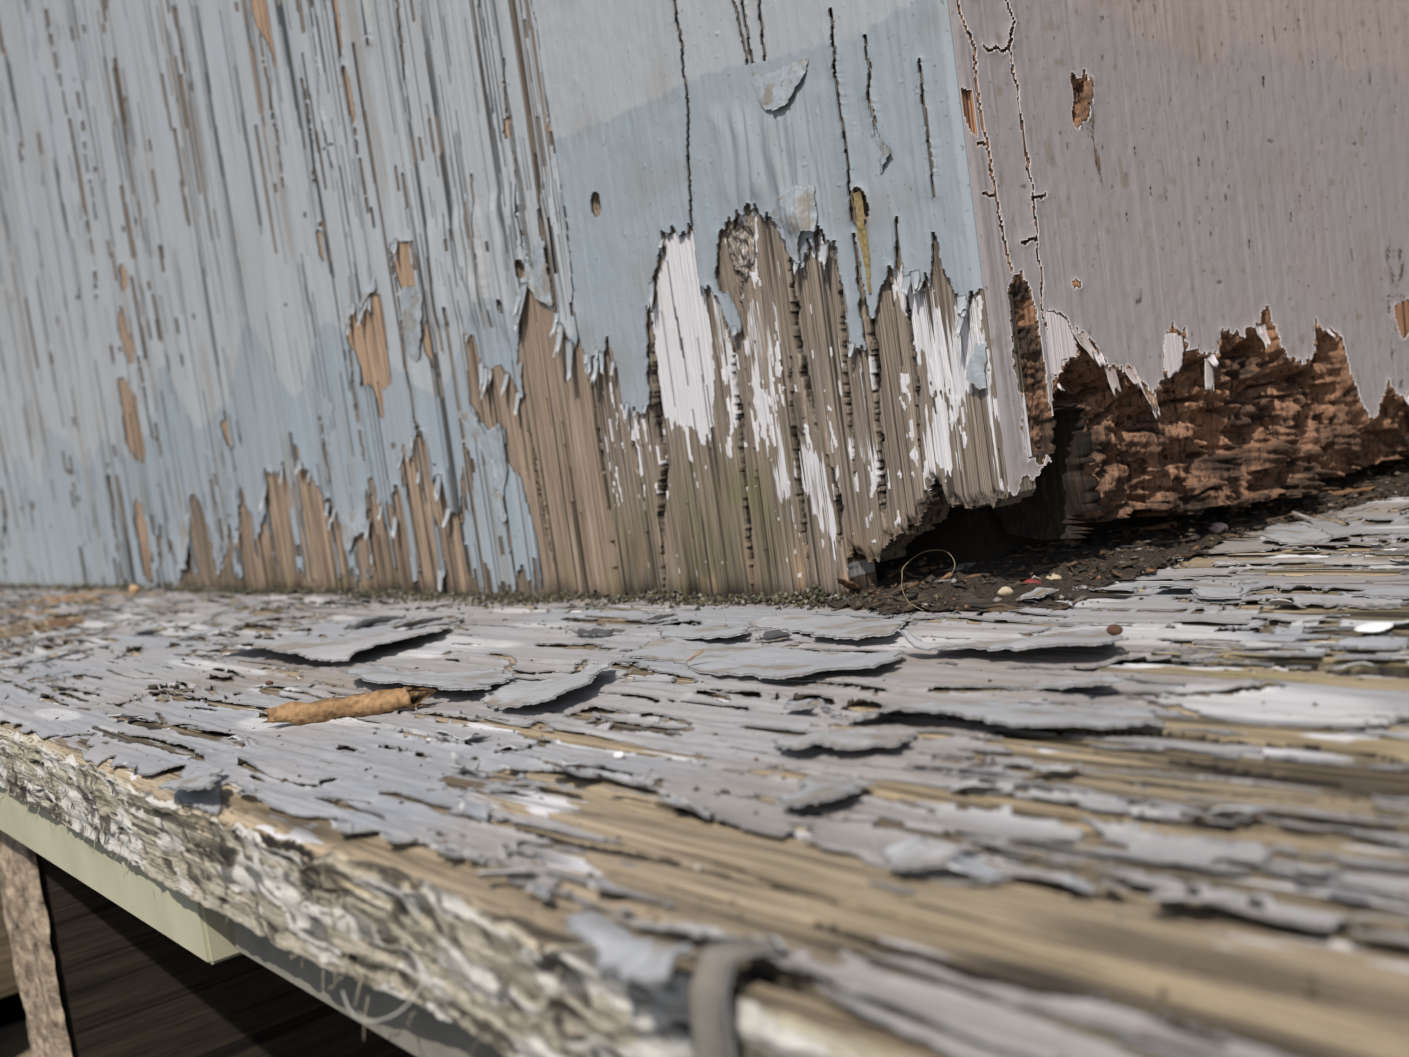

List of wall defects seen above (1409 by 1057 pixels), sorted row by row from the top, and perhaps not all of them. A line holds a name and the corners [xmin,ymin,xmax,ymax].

crack [956,0,1046,325]
peeling [177,185,1036,599]
spalling [1046,306,1409,523]
peeling [0,646,87,705]
peeling [131,623,161,632]
peeling [177,612,1129,710]
peeling [1128,543,1409,691]
peeling [2,674,1409,1057]